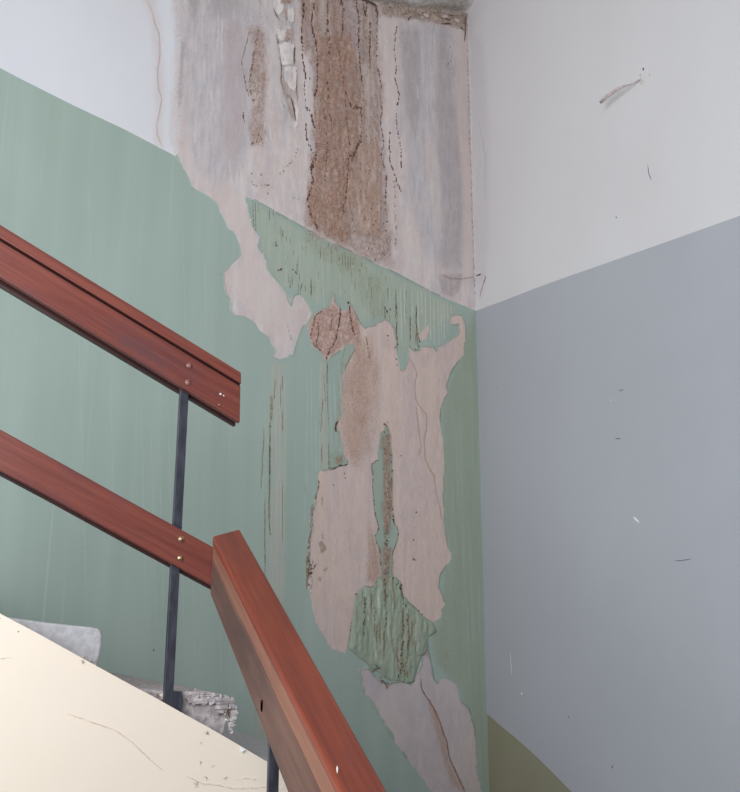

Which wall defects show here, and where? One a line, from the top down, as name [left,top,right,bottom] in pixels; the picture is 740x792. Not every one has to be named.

crack [143,0,169,151]
water stain [173,0,266,195]
water stain [250,0,492,359]
peeling [168,0,476,653]
spalling [185,688,238,734]
peeling [357,638,482,792]